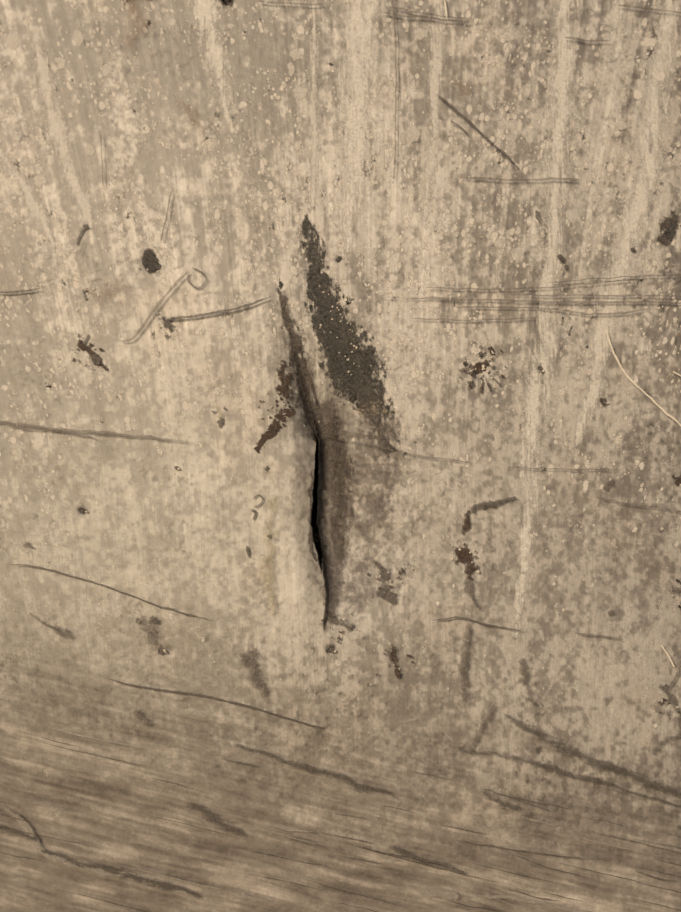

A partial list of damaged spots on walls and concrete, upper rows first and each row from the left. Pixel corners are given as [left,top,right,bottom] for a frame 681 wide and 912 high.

crack [277,278,328,630]
damp [277,0,400,563]